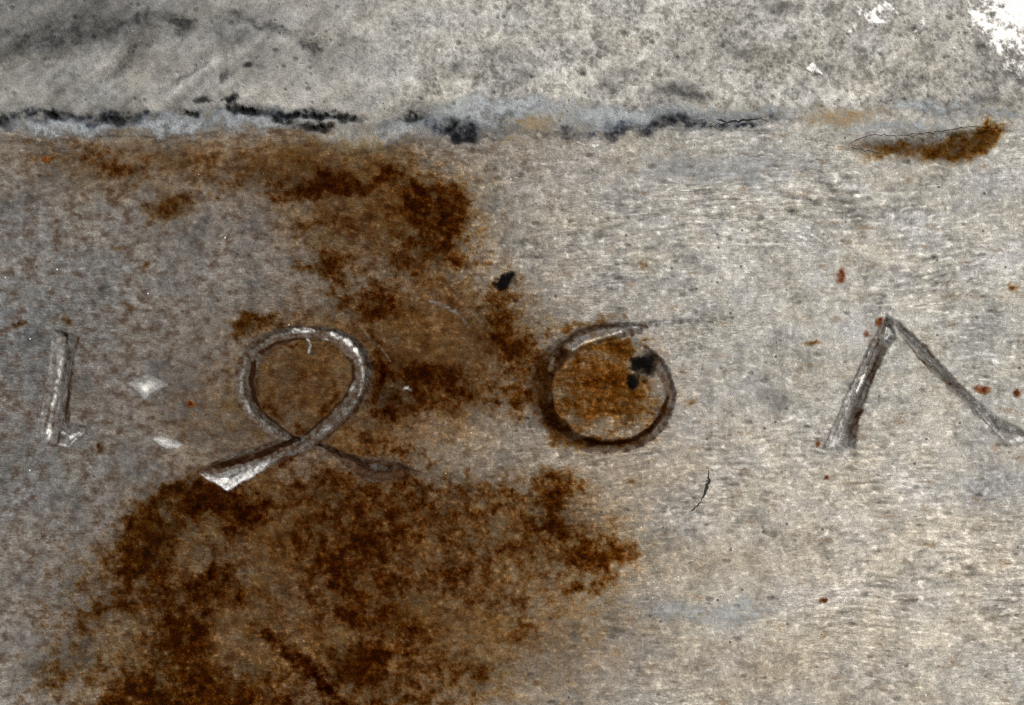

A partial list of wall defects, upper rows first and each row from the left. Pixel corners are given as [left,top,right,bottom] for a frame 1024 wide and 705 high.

corrosion [869,120,1003,162]
corrosion [148,195,191,219]
corrosion [272,164,471,276]
corrosion [296,250,396,322]
corrosion [233,311,283,338]
corrosion [371,288,664,448]
corrosion [77,432,637,705]